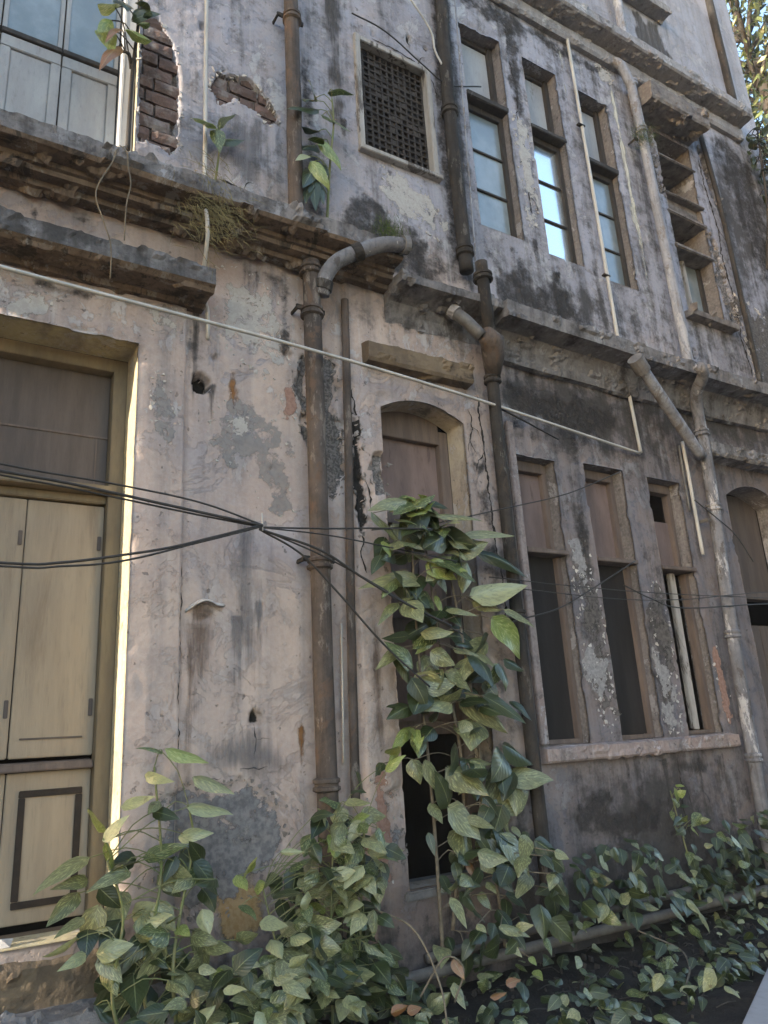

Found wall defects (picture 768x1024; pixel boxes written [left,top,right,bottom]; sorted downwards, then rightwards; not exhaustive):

spalling [135,18,184,155]
spalling [208,66,281,127]
water stain [345,197,440,281]
peeling [207,273,307,526]
crack [351,390,372,571]
crack [468,397,507,616]
peeling [567,538,622,733]
peeling [646,581,685,734]